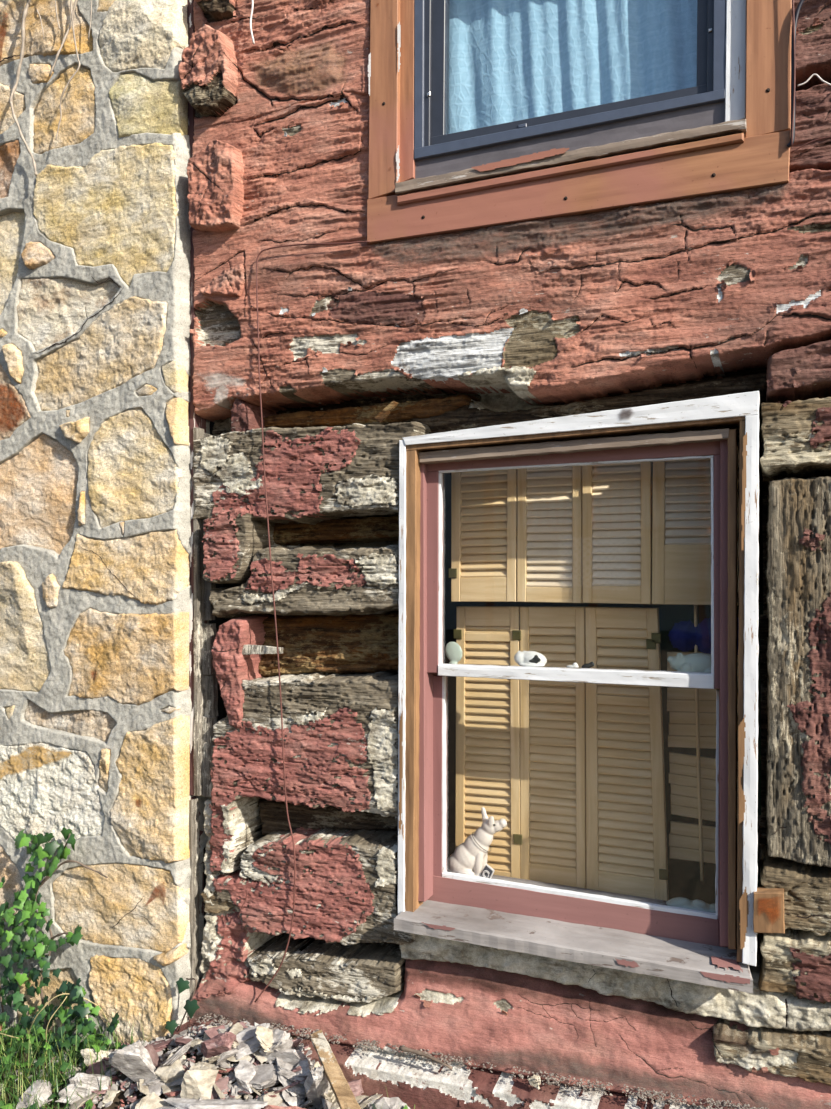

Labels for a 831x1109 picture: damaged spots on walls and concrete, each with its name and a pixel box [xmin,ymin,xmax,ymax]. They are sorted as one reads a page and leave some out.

crack [182,0,361,138]
peeling [289,287,581,402]
crack [490,212,831,369]
peeling [772,290,821,314]
peeling [190,427,367,593]
peeling [787,592,831,845]
peeling [194,708,374,1001]
peeling [413,989,464,1007]
peeling [345,1045,605,1109]
crack [518,967,753,1108]
peeling [624,1094,714,1109]
peeling [790,947,831,1003]